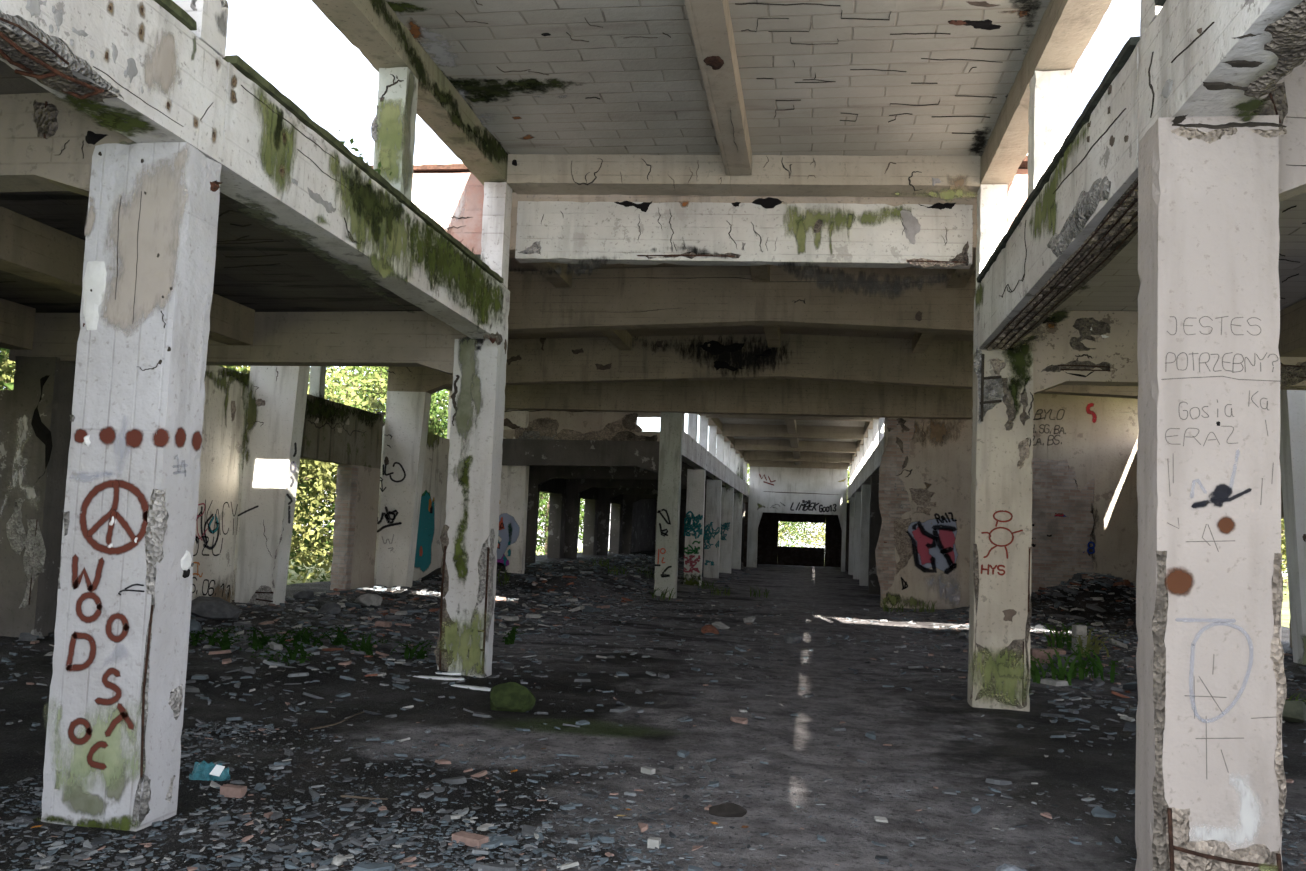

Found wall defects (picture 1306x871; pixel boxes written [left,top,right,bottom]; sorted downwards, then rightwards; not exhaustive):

crack [566,18,671,42]
crack [735,3,1021,134]
spalling [1171,0,1306,144]
water stain [237,0,539,312]
crack [571,159,777,279]
spalling [731,197,783,209]
crack [730,110,816,178]
water stain [796,214,853,254]
mould [634,336,792,377]
peeling [970,176,1138,709]
water stain [453,456,473,581]
spalling [1152,551,1287,871]